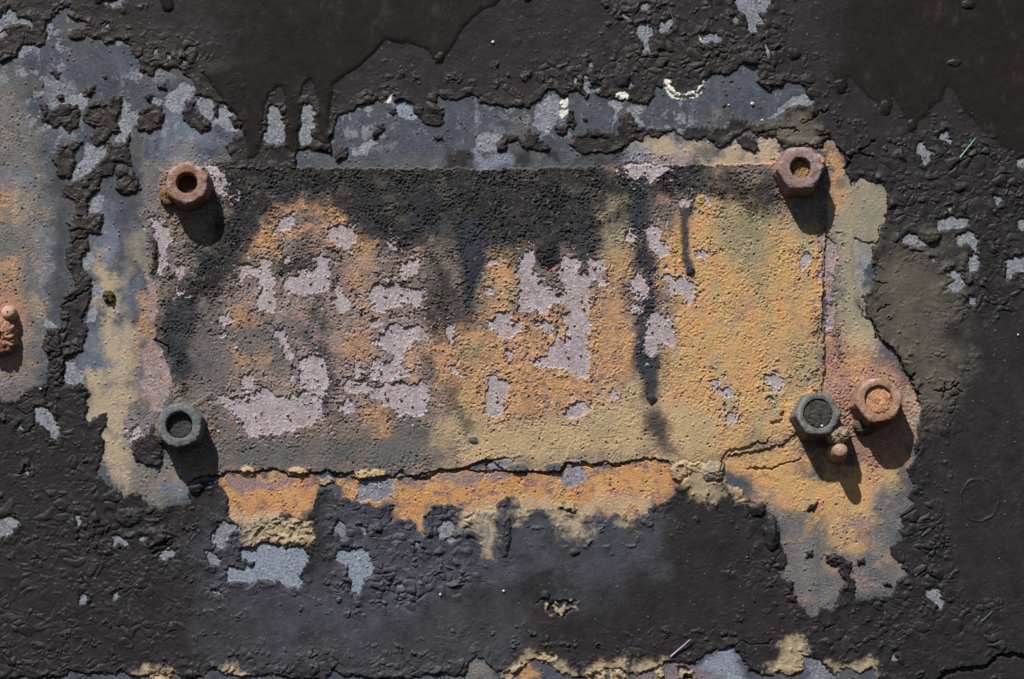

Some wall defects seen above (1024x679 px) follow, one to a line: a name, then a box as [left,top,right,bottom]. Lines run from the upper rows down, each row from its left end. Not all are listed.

peeling [663,79,706,100]
peeling [262,103,286,148]
peeling [299,98,318,150]
peeling [475,94,588,153]
corrosion [0,58,59,401]
peeling [39,69,249,391]
corrosion [71,138,319,529]
corrosion [227,105,978,560]
crack [188,457,669,486]
crack [720,408,802,473]
peeling [205,520,312,596]
peeling [336,548,375,594]